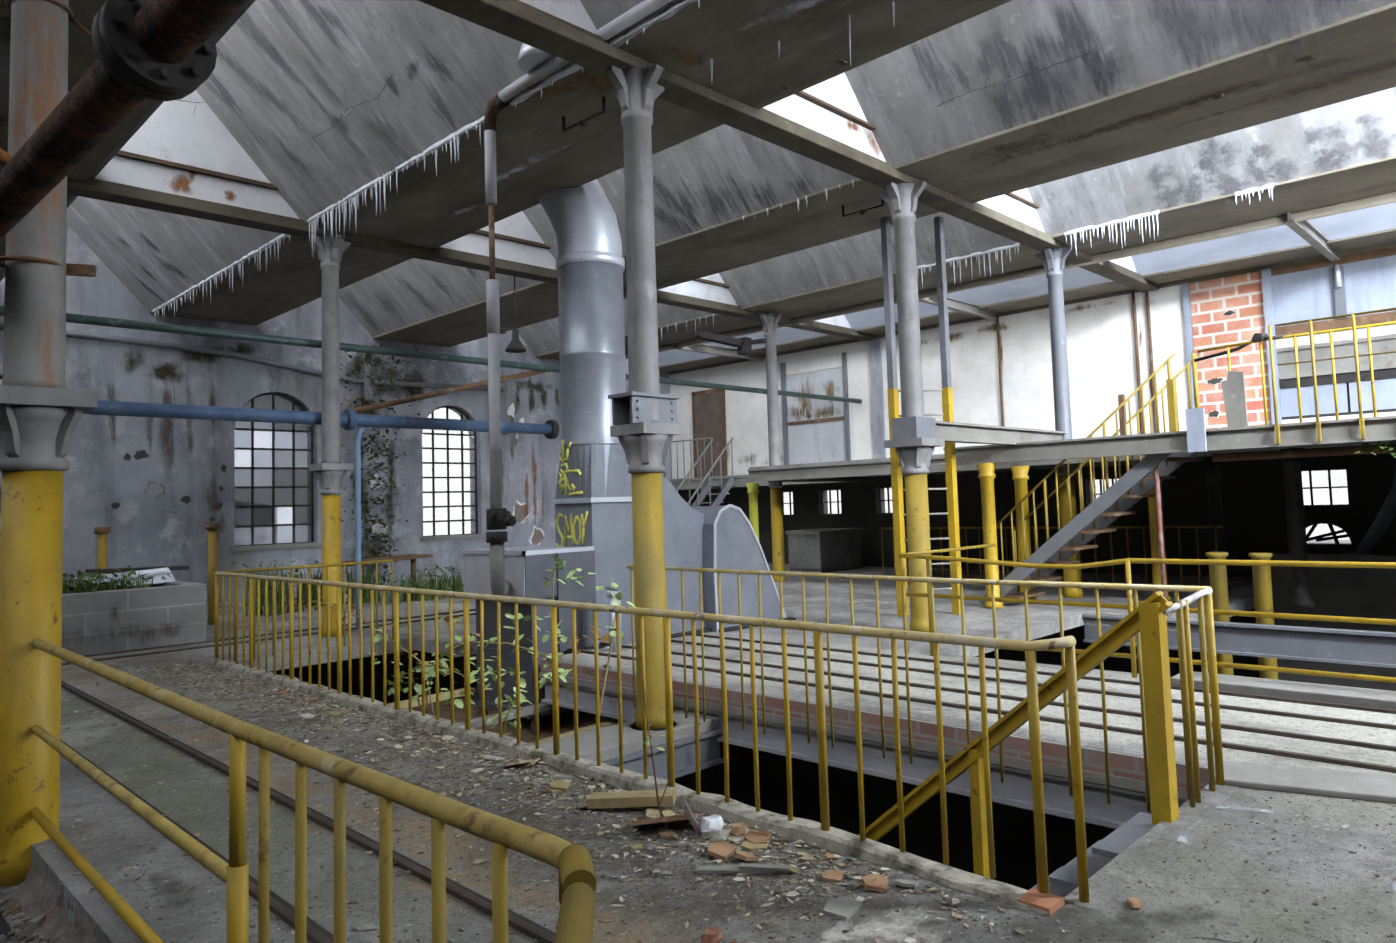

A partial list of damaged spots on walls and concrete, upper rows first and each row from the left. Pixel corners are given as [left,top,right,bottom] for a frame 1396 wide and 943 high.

water stain [912,0,1394,155]
mould [1305,116,1393,171]
corrosion [172,172,195,192]
water stain [1064,139,1293,255]
crack [1192,925,1332,943]